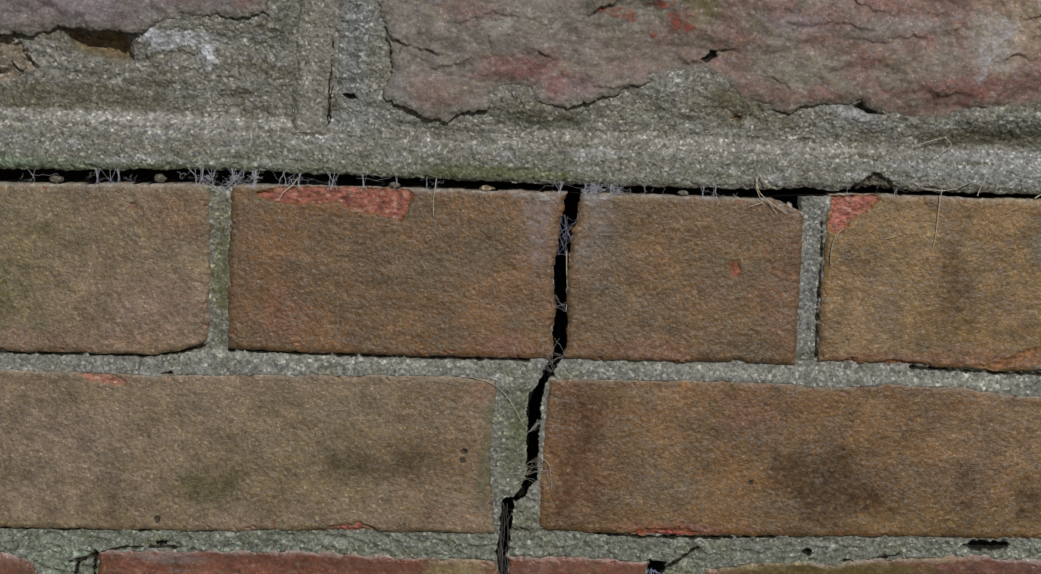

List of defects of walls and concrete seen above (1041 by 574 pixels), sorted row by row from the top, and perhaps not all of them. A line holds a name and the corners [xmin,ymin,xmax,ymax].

spalling [257,185,416,222]
spalling [828,172,897,234]
crack [0,168,1019,574]
crack [909,364,1041,376]